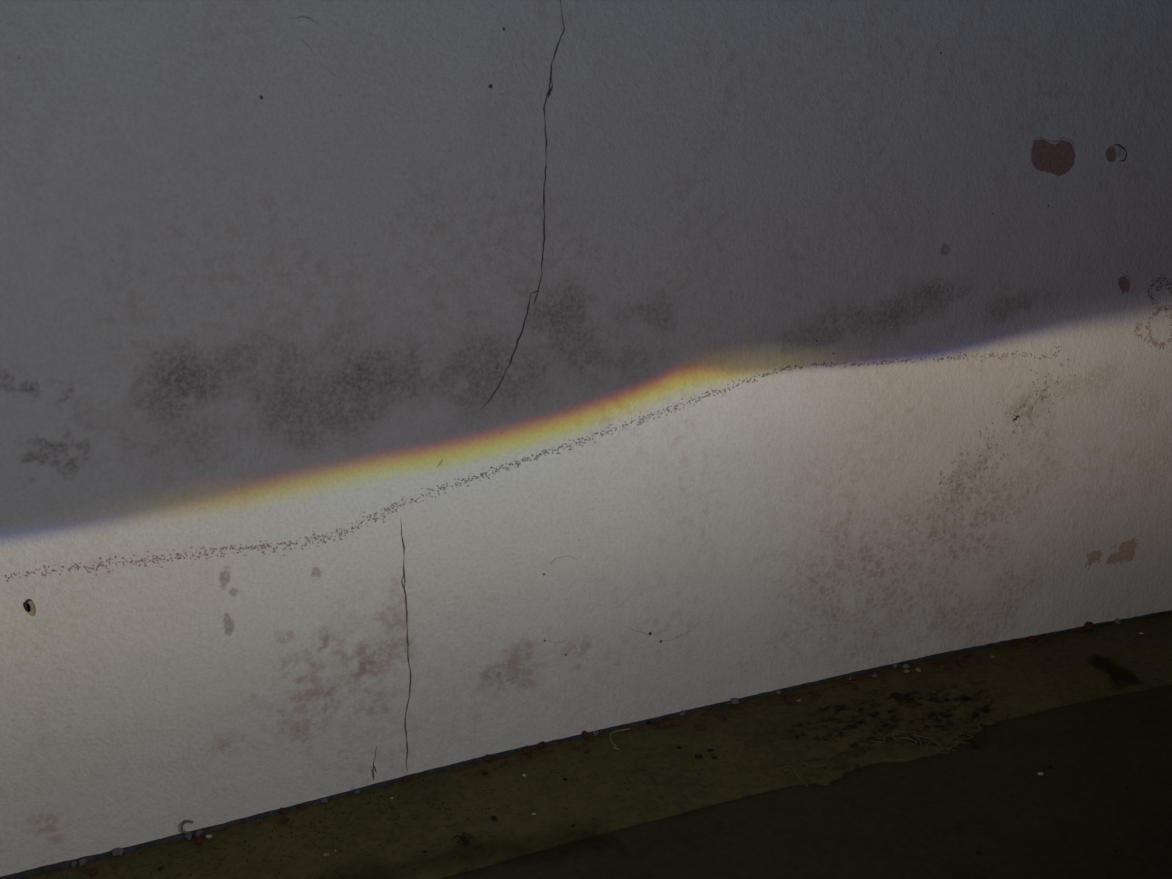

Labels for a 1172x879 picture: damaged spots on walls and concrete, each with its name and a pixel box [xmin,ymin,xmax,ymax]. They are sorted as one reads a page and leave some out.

crack [482,1,565,408]
spalling [1031,137,1077,176]
crack [401,524,412,772]